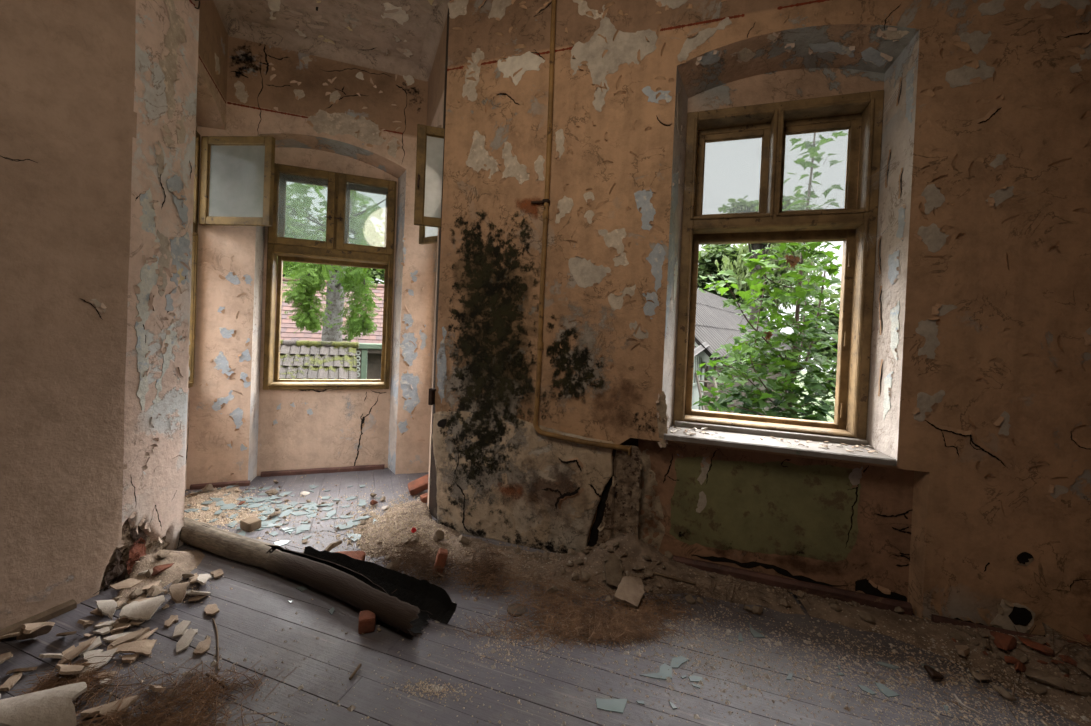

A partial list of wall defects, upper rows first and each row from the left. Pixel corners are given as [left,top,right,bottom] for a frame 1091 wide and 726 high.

peeling [448,0,469,19]
peeling [497,51,546,86]
peeling [466,129,565,185]
peeling [133,188,192,416]
peeling [608,187,678,341]
peeling [210,327,251,451]
crack [354,391,386,466]
peeling [398,314,427,435]
peeling [436,326,447,411]
damp [439,211,657,535]
crack [542,457,603,509]
spalling [101,512,176,591]